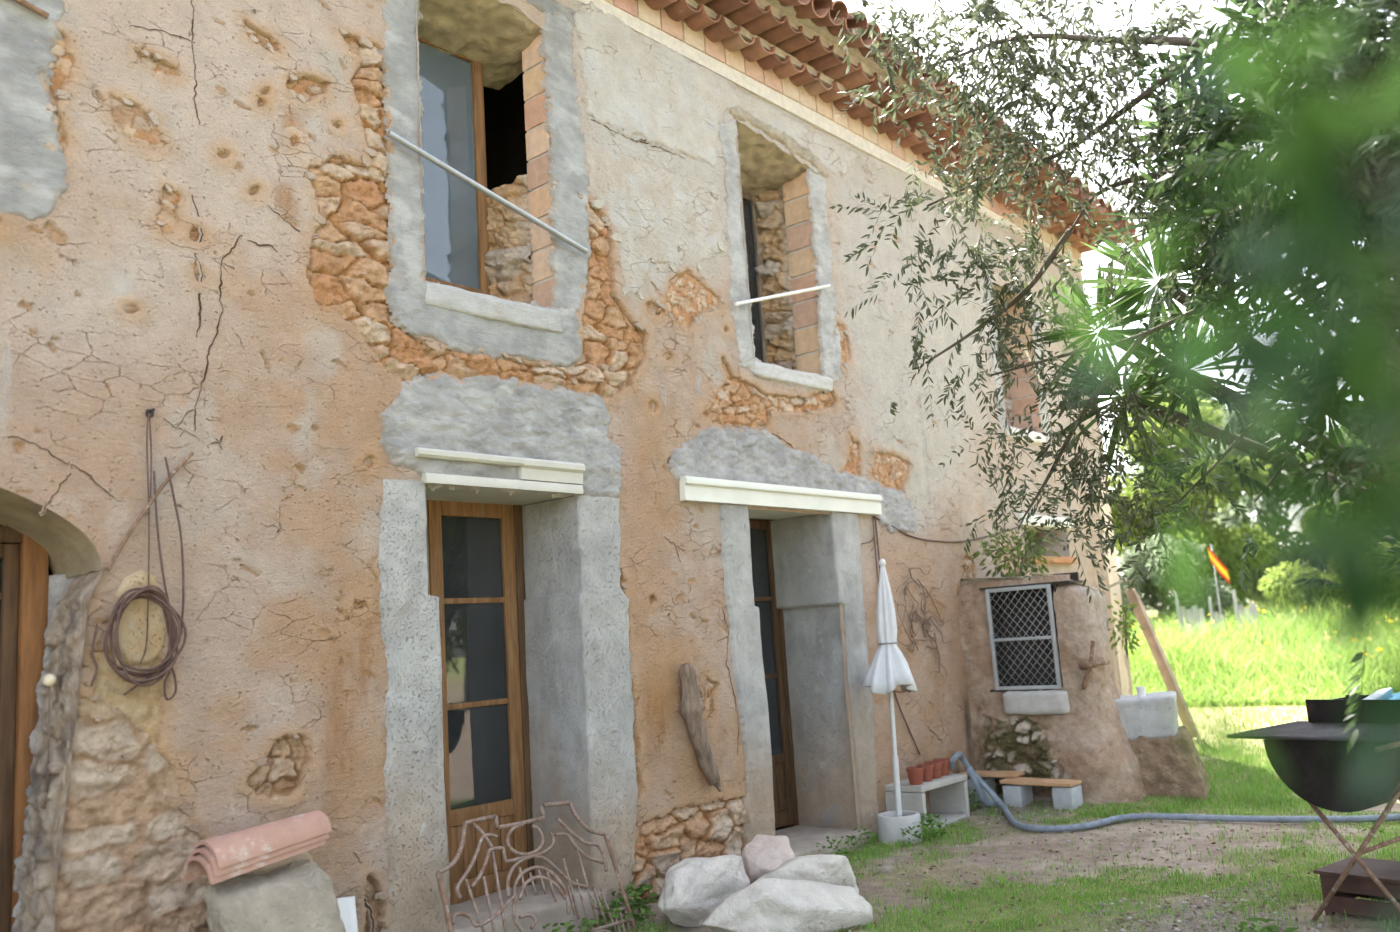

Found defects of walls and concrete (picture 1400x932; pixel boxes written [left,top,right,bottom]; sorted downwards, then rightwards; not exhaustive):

spalling [109,96,163,150]
crack [129,0,201,125]
hole [286,74,325,103]
spalling [156,184,200,242]
spalling [305,27,727,397]
crack [162,187,318,451]
spalling [703,358,844,430]
crack [7,435,115,517]
spalling [843,441,913,492]
spalling [51,651,210,932]
spalling [247,734,306,797]
spalling [628,737,747,908]